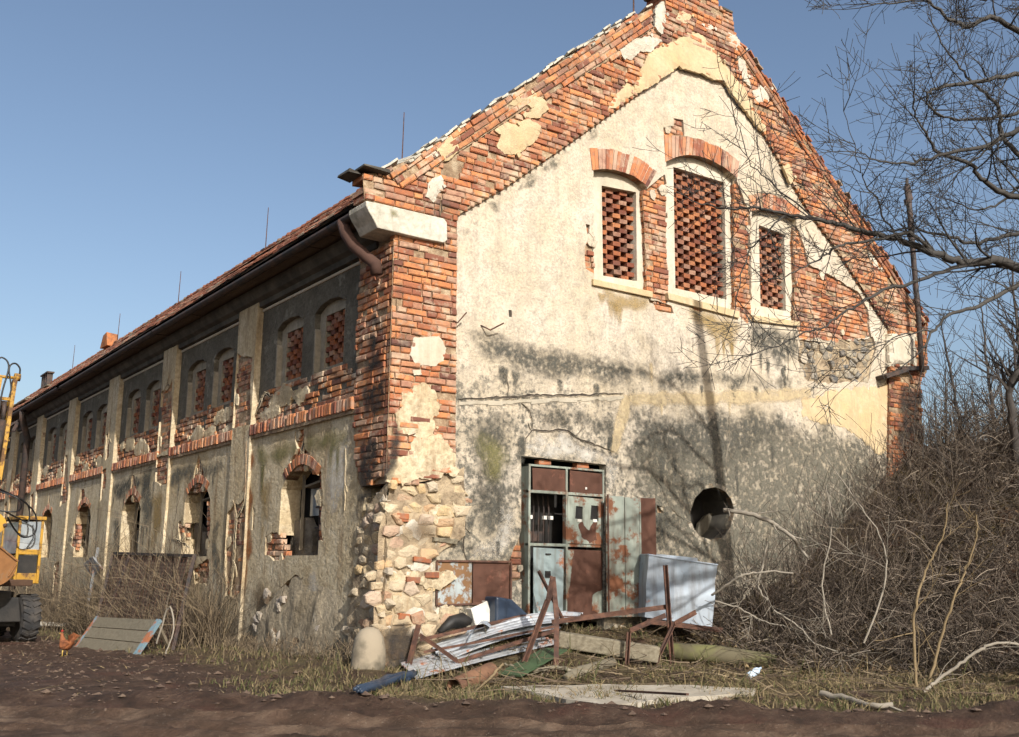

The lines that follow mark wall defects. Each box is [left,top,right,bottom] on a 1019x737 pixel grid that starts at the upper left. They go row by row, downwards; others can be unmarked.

peeling [607,1,774,135]
peeling [494,90,549,158]
spalling [187,355,310,441]
crack [460,376,623,452]
water stain [480,341,646,396]
water stain [660,370,758,400]
water stain [752,326,798,387]
spalling [790,227,889,455]
spalling [267,533,292,561]
spalling [341,370,472,671]
water stain [467,418,594,551]
water stain [631,410,882,575]